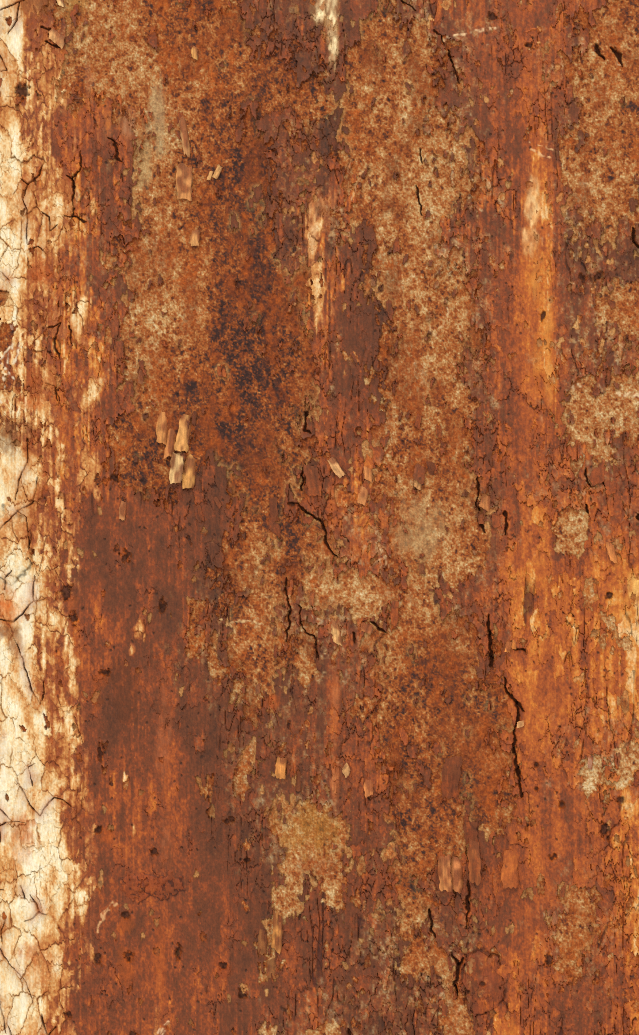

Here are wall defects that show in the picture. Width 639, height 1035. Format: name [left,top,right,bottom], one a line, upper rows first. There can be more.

crack [0,0,60,73]
peeling [557,0,639,343]
corrosion [539,315,639,385]
peeling [549,360,639,495]
peeling [49,0,540,1035]
crack [0,438,46,705]
crack [0,764,71,844]
corrosion [248,692,336,795]
peeling [578,739,639,806]
corrosion [351,840,401,945]
crack [0,886,57,1035]
corrosion [112,903,146,1005]